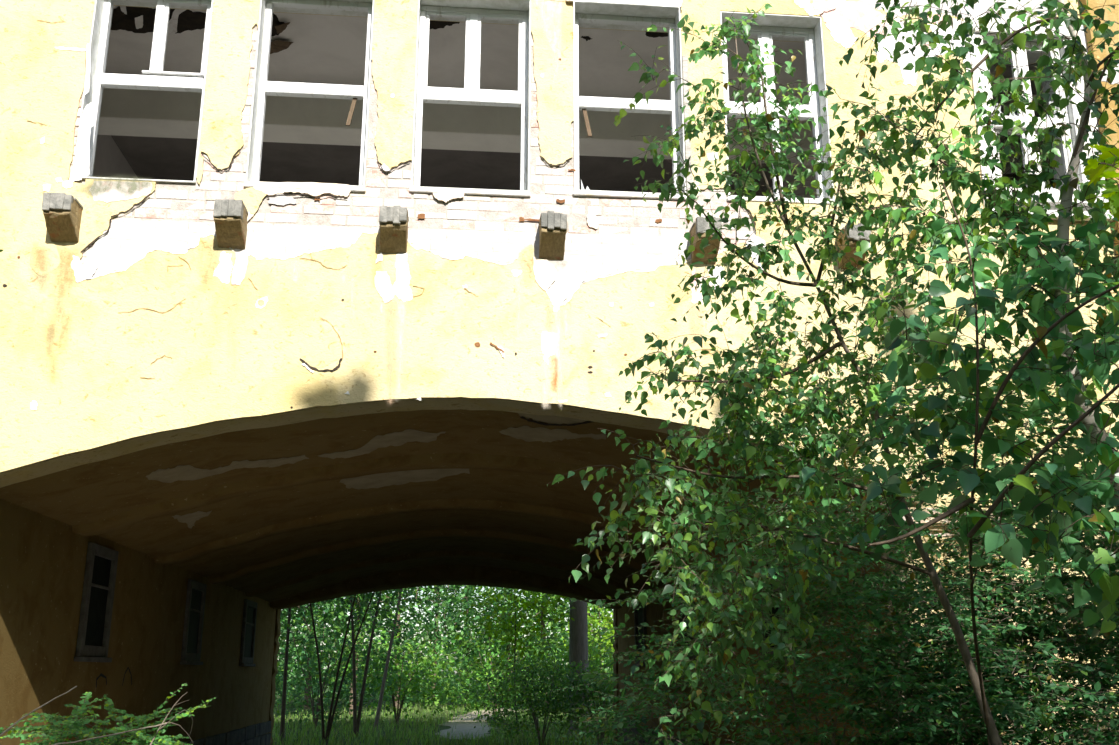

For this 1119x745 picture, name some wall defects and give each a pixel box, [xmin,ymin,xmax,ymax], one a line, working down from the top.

spalling [565,0,682,8]
peeling [794,0,1058,86]
spalling [43,24,766,312]